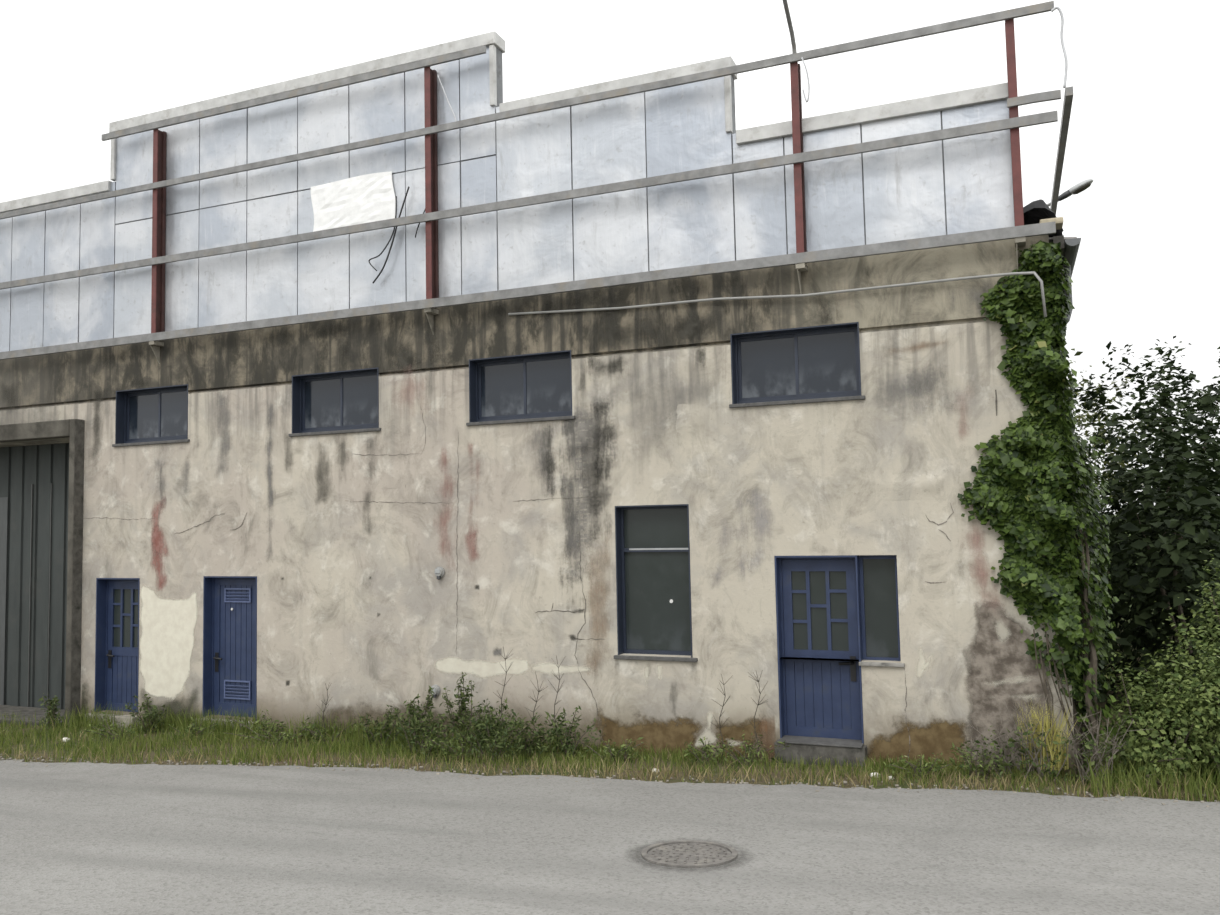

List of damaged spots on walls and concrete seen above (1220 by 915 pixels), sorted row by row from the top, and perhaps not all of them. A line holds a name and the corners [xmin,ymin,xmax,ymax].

leakage [597,321,660,372]
leakage [540,436,552,479]
leakage [568,405,604,549]
corrosion [152,503,168,588]
crack [536,530,599,722]
leakage [596,711,701,754]
leakage [717,719,762,757]